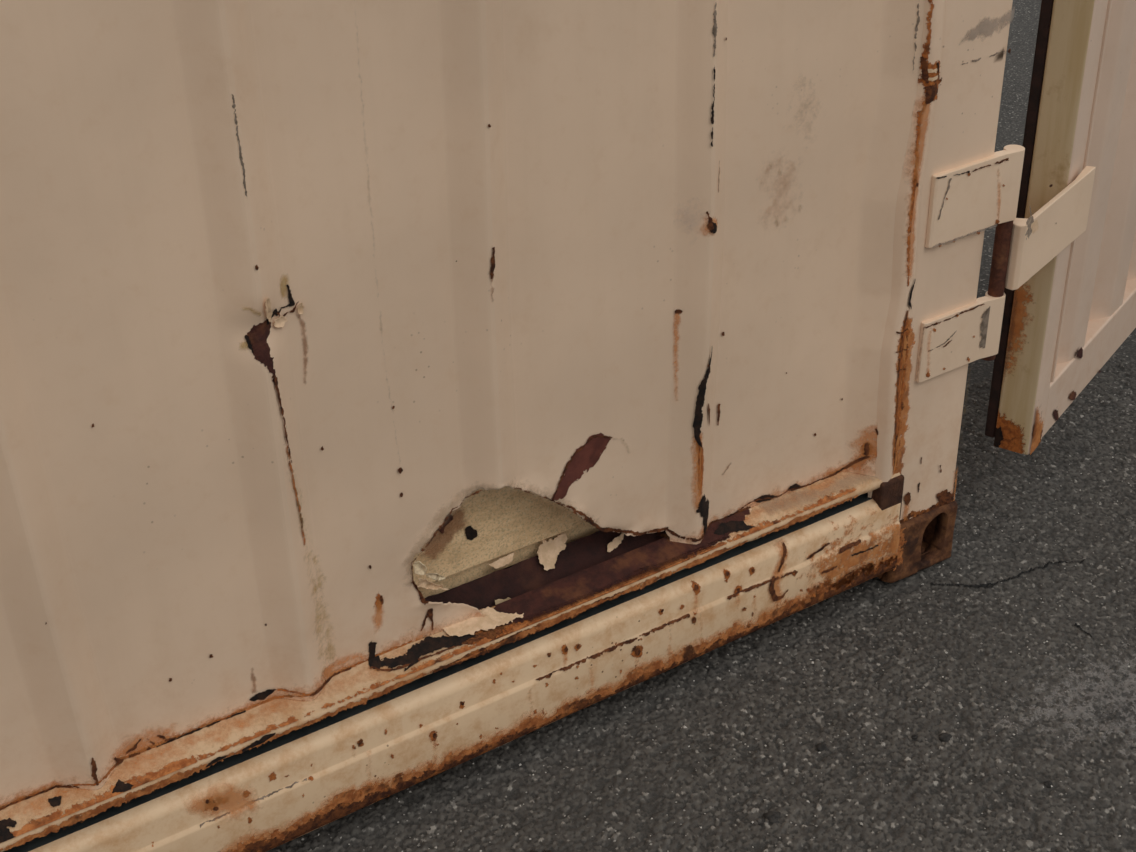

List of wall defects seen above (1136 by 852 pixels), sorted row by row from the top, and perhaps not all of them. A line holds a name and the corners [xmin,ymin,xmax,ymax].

corrosion [893,0,942,475]
corrosion [674,309,682,371]
corrosion [1003,285,1033,374]
corrosion [247,319,306,545]
corrosion [994,407,1044,455]
peeling [552,433,612,527]
peeling [413,561,449,590]
peeling [488,552,514,569]
peeling [537,533,568,571]
peeling [607,533,624,552]
corrosion [0,429,957,852]
peeling [441,597,524,637]